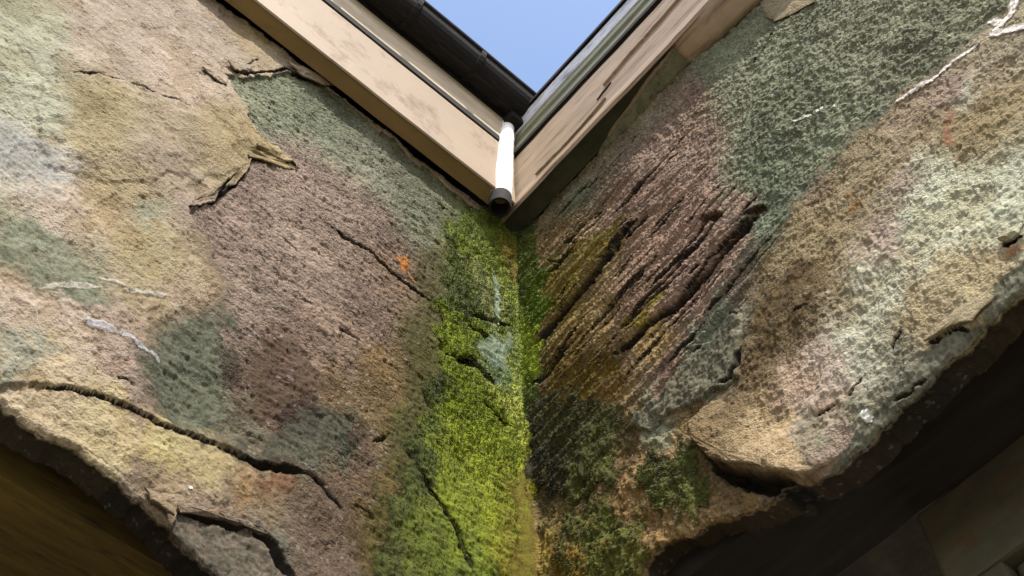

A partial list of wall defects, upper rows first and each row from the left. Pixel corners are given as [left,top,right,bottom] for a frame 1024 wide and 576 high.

crack [52,71,188,105]
crack [205,58,318,85]
water stain [888,0,1024,107]
peeling [137,60,495,576]
rust [397,256,415,282]
peeling [468,314,510,340]
water stain [476,271,512,386]
crack [533,176,638,385]
crack [611,204,767,355]
peeling [523,0,1024,576]
crack [32,377,372,518]
crack [177,511,295,576]